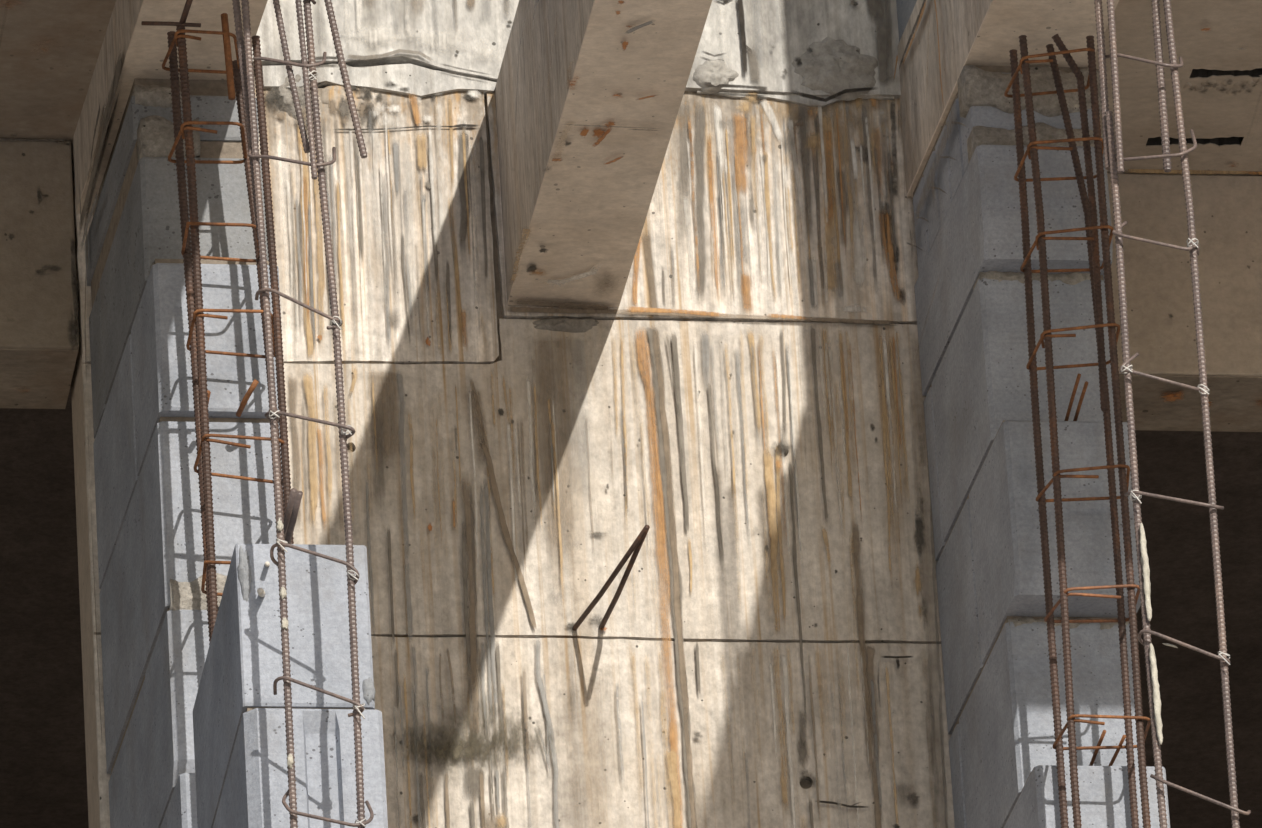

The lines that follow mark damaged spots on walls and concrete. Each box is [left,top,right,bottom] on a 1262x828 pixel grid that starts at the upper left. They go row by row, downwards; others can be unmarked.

water stain [265,86,313,124]
water stain [287,83,451,340]
water stain [458,133,487,277]
corrosion [727,92,775,292]
corrosion [785,109,880,289]
corrosion [879,213,899,299]
corrosion [508,236,893,571]
water stain [366,483,374,626]
water stain [372,357,570,828]
corrosion [614,331,683,828]
corrosion [764,447,786,630]
corrosion [851,526,873,767]